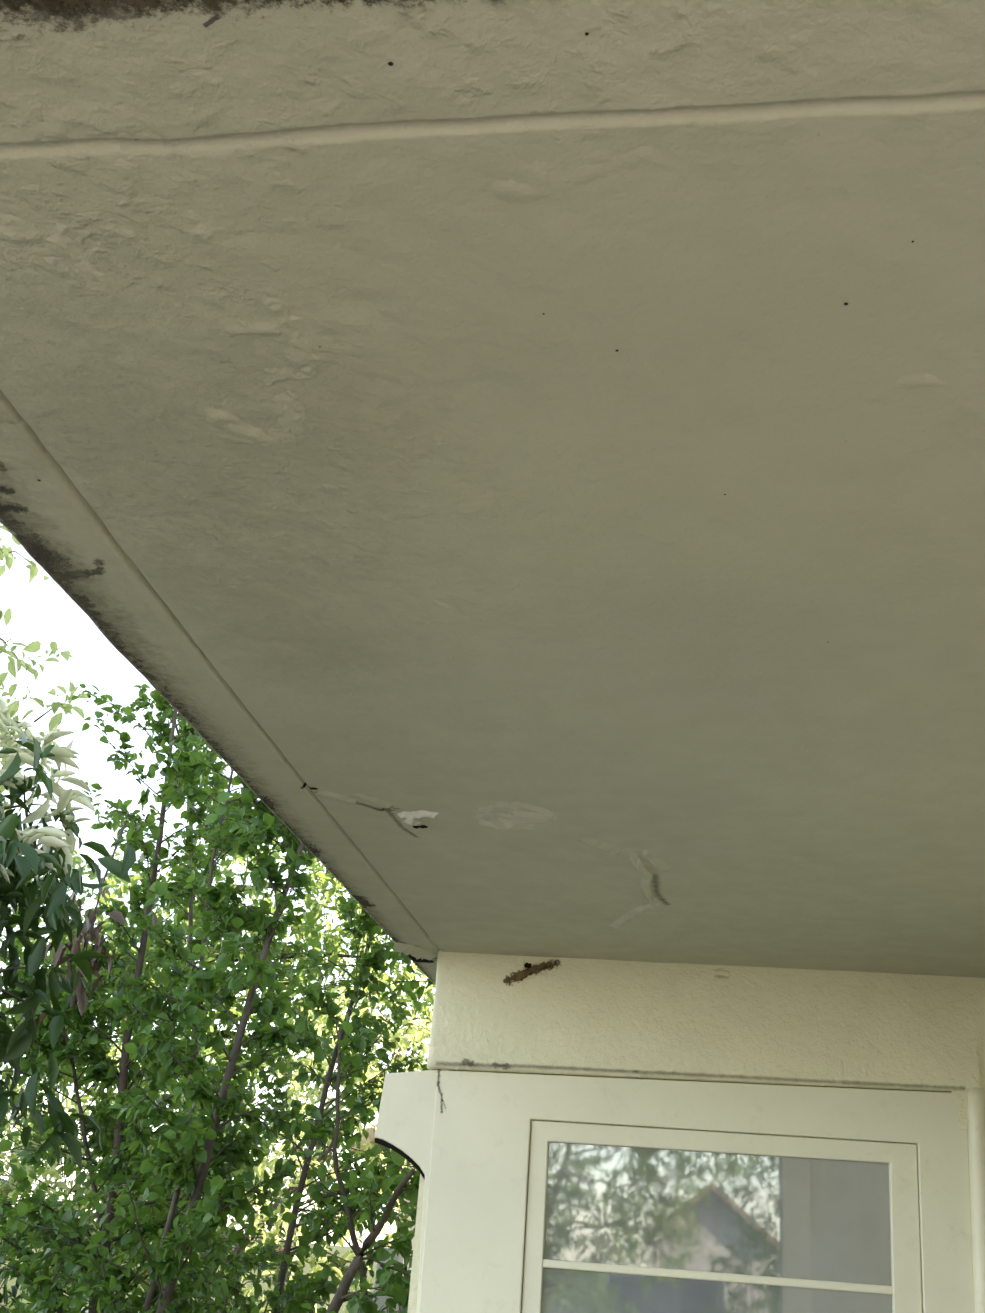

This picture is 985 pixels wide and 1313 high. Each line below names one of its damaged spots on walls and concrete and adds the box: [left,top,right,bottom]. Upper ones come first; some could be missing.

leakage [0,464,29,513]
leakage [11,532,104,580]
spalling [397,810,439,829]